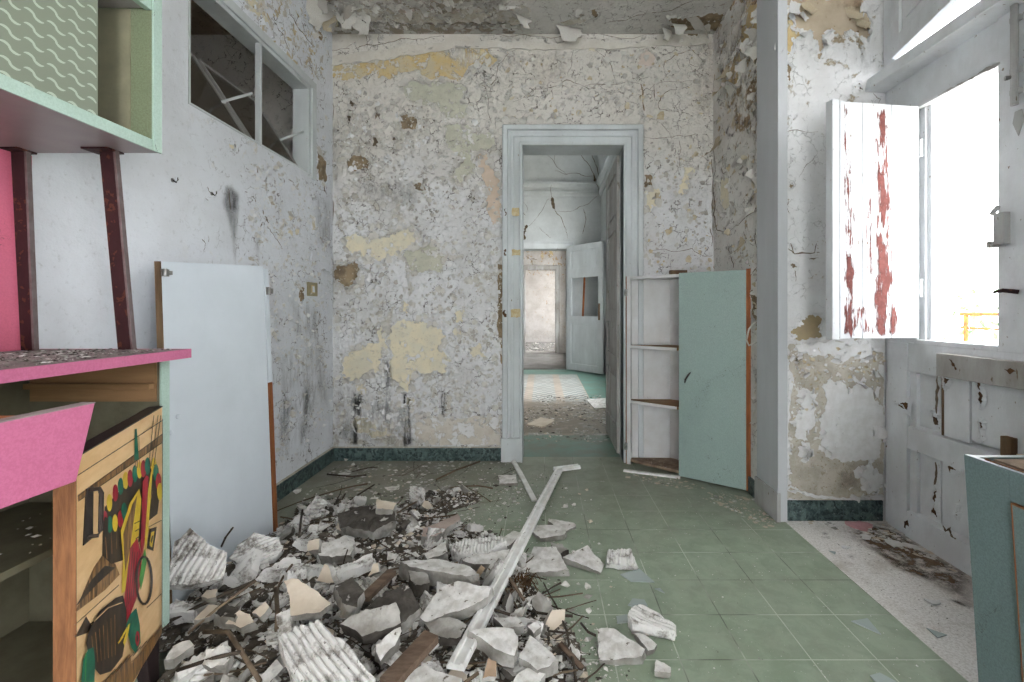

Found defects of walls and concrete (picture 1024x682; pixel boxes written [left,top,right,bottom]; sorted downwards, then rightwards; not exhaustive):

peeling [243,0,757,447]
crack [524,155,599,238]
peeling [774,0,874,84]
peeling [787,104,898,504]